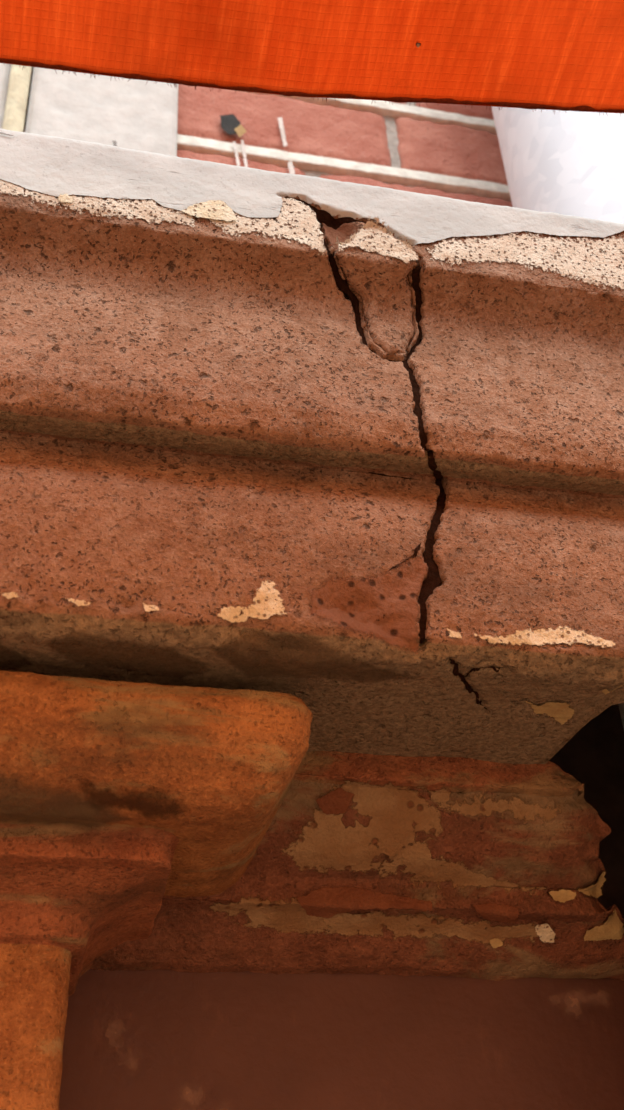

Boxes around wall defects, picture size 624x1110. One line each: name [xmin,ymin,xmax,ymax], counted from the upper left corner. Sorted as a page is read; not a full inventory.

peeling [0,180,624,289]
crack [290,199,446,644]
peeling [217,580,287,623]
peeling [447,626,616,648]
crack [449,659,509,709]
peeling [209,780,606,948]
peeling [584,909,624,941]